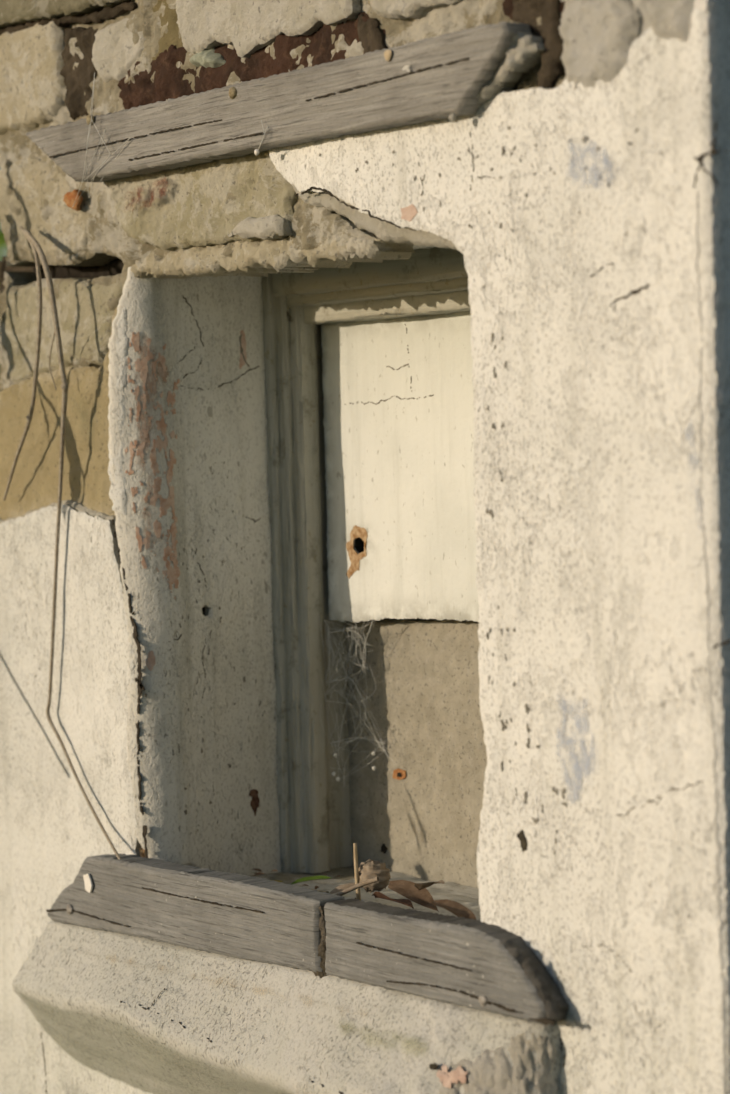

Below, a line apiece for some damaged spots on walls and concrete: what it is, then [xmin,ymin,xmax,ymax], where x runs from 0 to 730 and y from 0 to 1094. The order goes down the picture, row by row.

crack [469,132,502,191]
crack [295,187,400,228]
spalling [0,0,574,599]
crack [610,284,650,312]
crack [617,122,730,1094]
peeling [146,651,155,671]
crack [112,519,148,858]
rust [392,769,406,780]
rust [249,789,260,816]